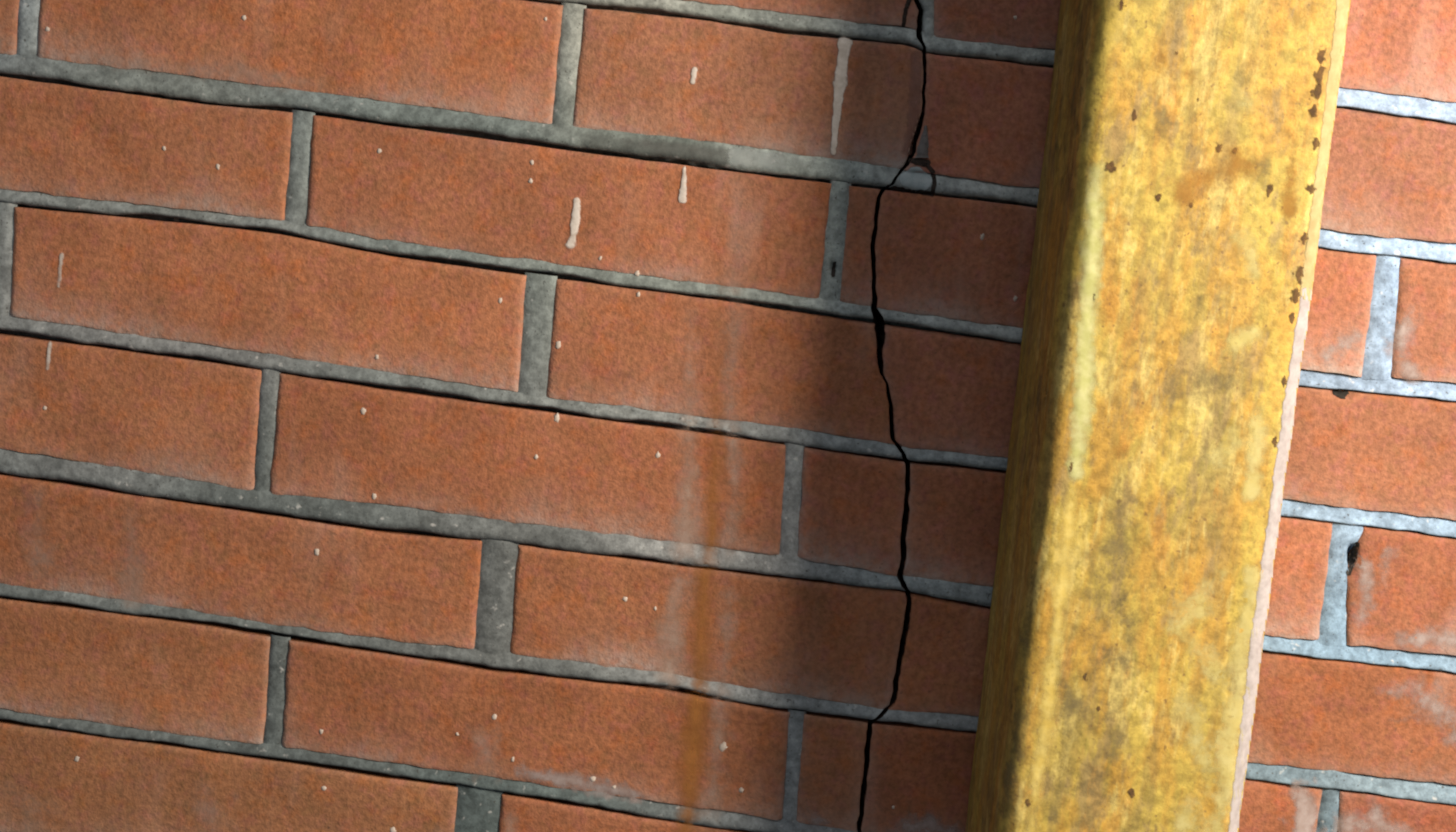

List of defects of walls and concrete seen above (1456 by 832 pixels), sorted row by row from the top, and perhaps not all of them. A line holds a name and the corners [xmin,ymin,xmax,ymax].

damp [831,37,853,155]
corrosion [1283,185,1295,216]
crack [857,0,937,832]